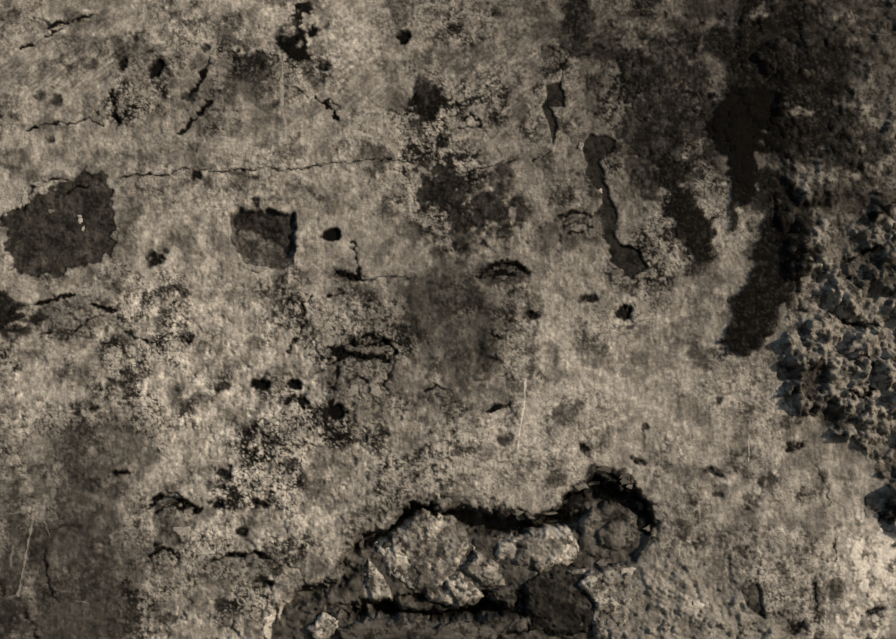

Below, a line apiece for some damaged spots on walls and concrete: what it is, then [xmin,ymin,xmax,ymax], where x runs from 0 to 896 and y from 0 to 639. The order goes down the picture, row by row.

spalling [730,0,781,37]
peeling [542,51,587,144]
spalling [224,197,296,273]
peeling [578,134,648,280]
damp [539,0,896,365]
spalling [776,0,896,505]
damp [0,290,49,338]
spalling [216,466,231,480]
peeling [299,442,818,639]
spalling [878,515,896,532]
spalling [254,576,273,588]
spalling [262,597,292,639]